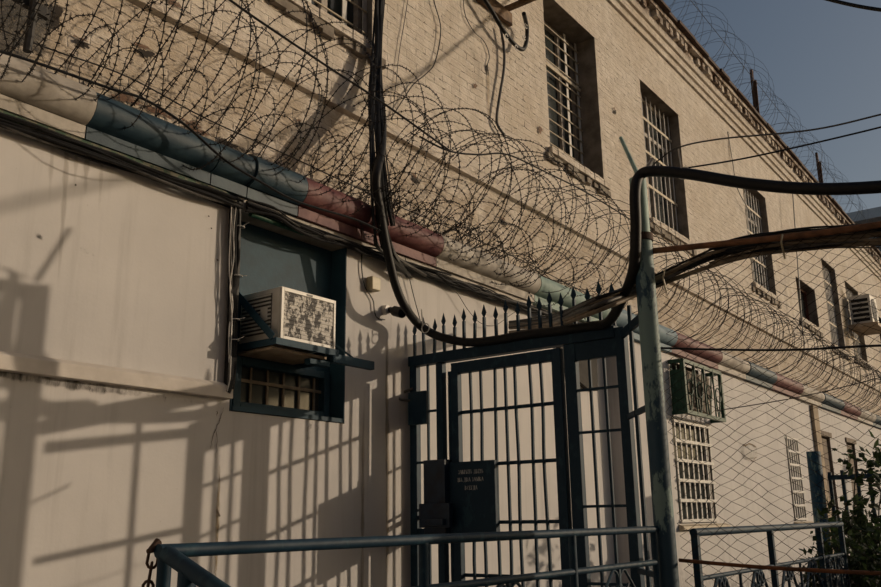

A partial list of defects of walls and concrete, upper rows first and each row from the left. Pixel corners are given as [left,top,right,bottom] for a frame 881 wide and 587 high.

damp [38,377,106,393]
crack [210,411,223,576]